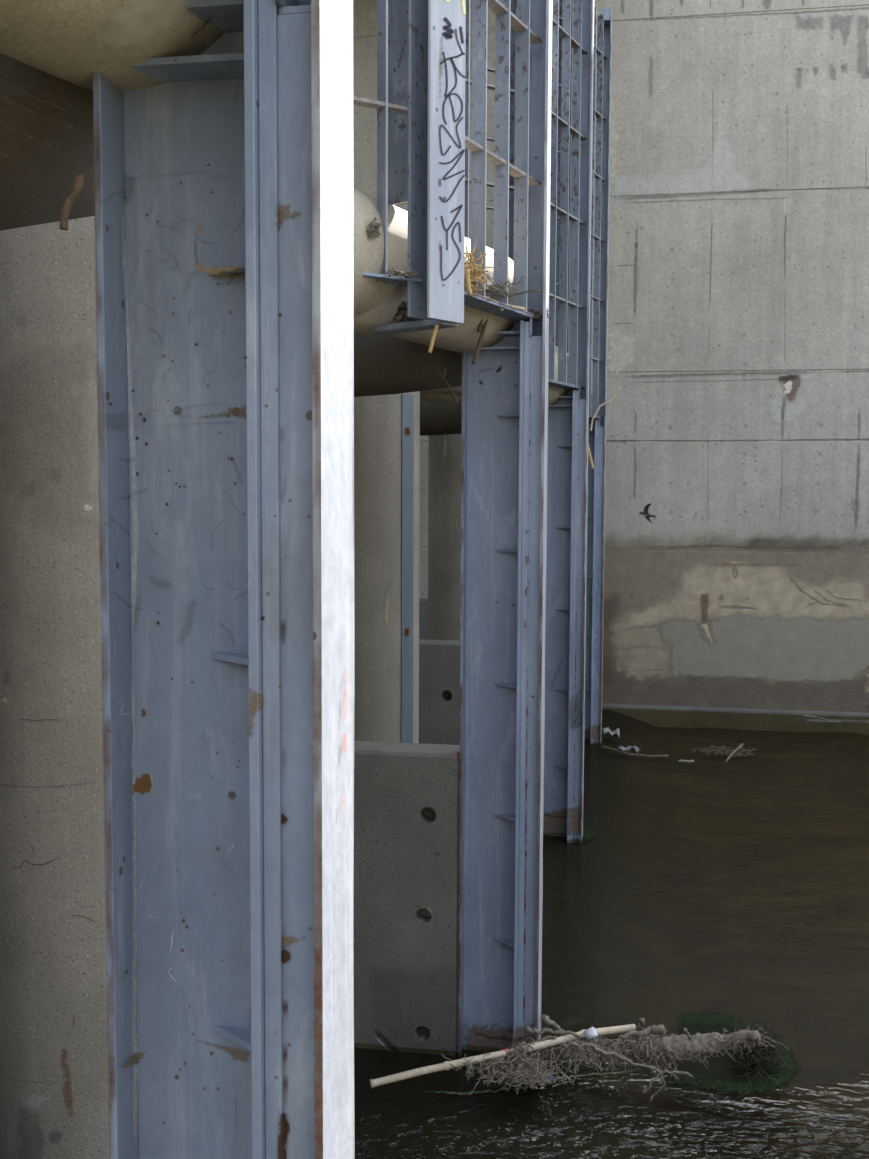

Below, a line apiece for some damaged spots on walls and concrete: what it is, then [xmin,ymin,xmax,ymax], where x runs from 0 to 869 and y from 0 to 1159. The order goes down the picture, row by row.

corrosion [574,558,604,776]
leakage [602,541,869,712]
corrosion [458,643,583,1068]
corrosion [278,1114,290,1159]